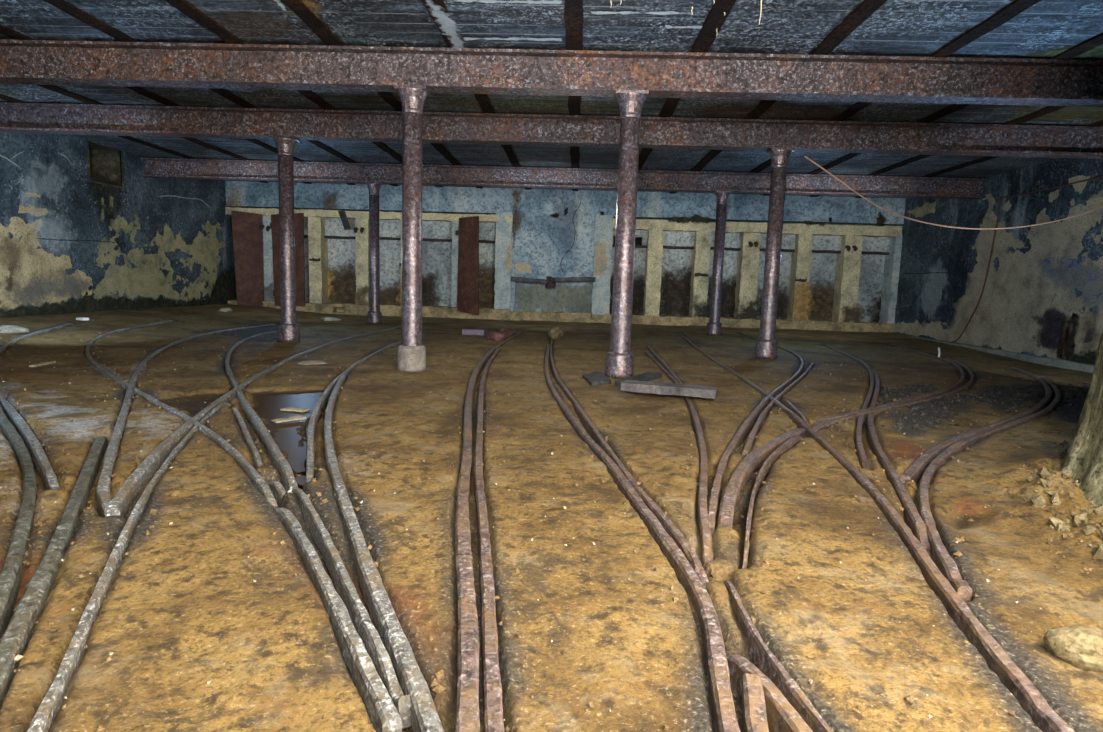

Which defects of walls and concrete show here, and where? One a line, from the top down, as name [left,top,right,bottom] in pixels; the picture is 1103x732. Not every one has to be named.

efflorescence [427,0,562,48]
peeling [0,192,225,311]
leakage [328,264,401,305]
leakage [422,273,439,306]
leakage [479,264,495,307]
leakage [632,273,645,315]
leakage [659,266,763,319]
leakage [776,283,789,320]
peeling [894,175,1103,360]
leakage [1033,309,1096,365]